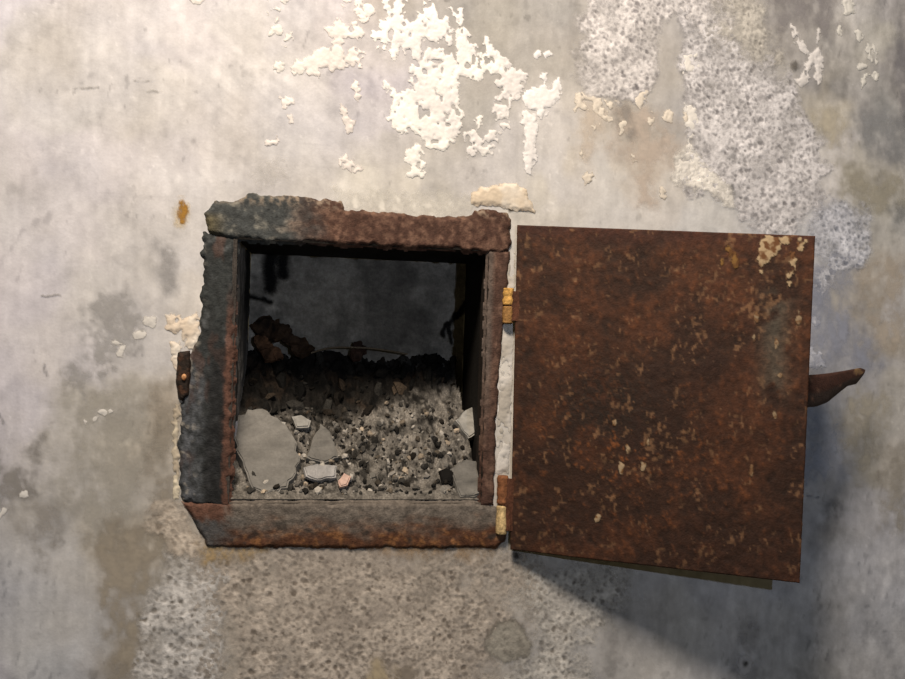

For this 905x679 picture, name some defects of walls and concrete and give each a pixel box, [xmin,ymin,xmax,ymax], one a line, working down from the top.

peeling [273,0,562,178]
flaking render [471,183,535,213]